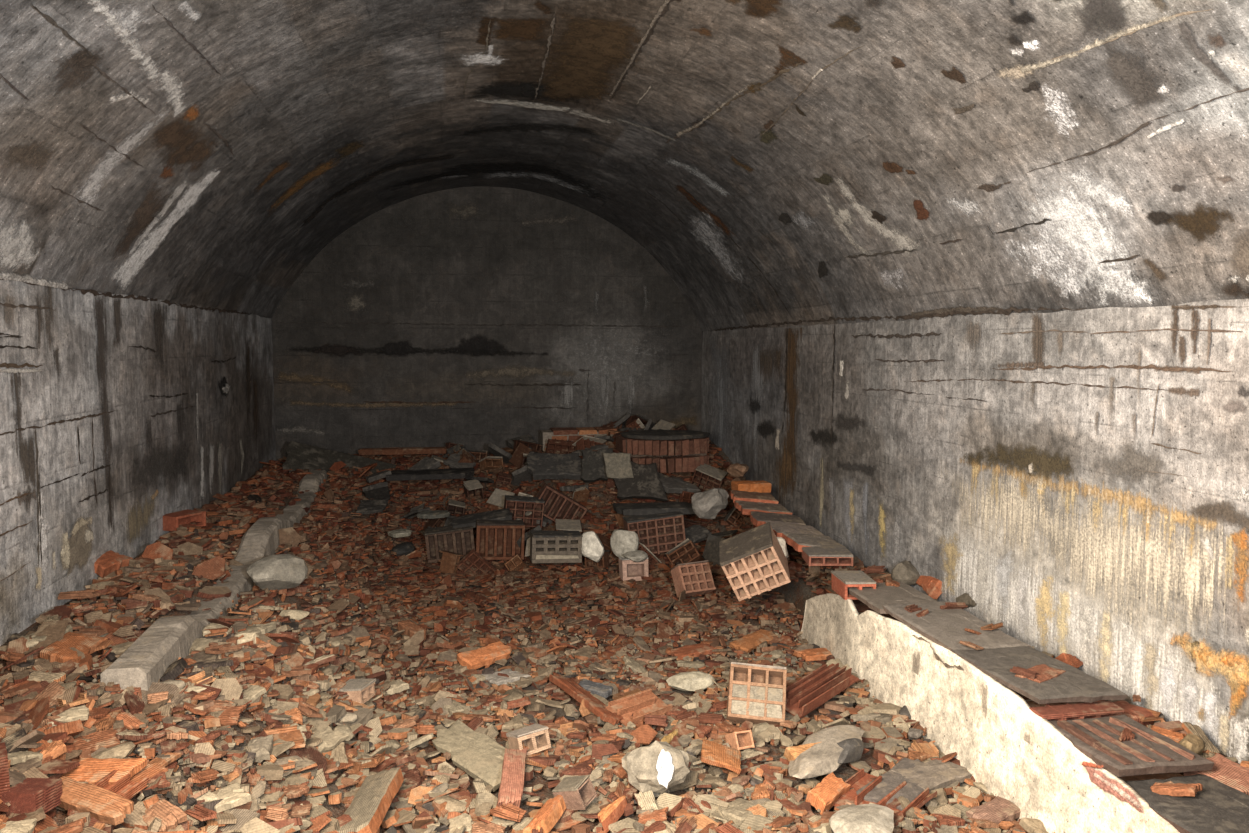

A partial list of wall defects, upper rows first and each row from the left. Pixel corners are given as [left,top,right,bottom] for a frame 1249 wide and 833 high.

leakage [76,0,186,210]
crack [666,46,863,143]
crack [1027,88,1249,173]
crack [0,272,251,373]
crack [273,176,1247,477]
leakage [1006,170,1152,304]
leakage [1171,305,1219,365]
leakage [11,373,71,589]
crack [0,410,117,581]
leakage [941,531,1249,764]
rust [956,460,1249,718]
leakage [1191,487,1249,530]